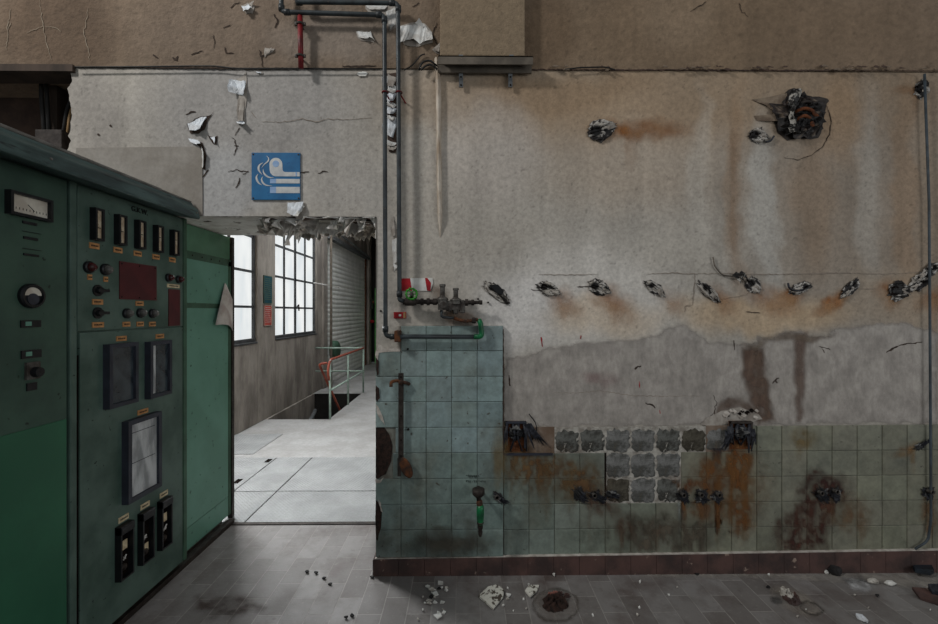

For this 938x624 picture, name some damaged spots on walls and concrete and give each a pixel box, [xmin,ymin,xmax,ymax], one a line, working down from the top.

peeling [365,5,440,55]
peeling [227,71,263,126]
crack [202,113,363,188]
peeling [381,73,397,153]
hole [748,88,829,144]
flaking render [257,200,376,245]
spalling [375,386,392,483]
peeling [504,323,938,518]
leakage [718,348,773,422]
leakage [779,334,818,420]
corrosion [682,441,753,534]